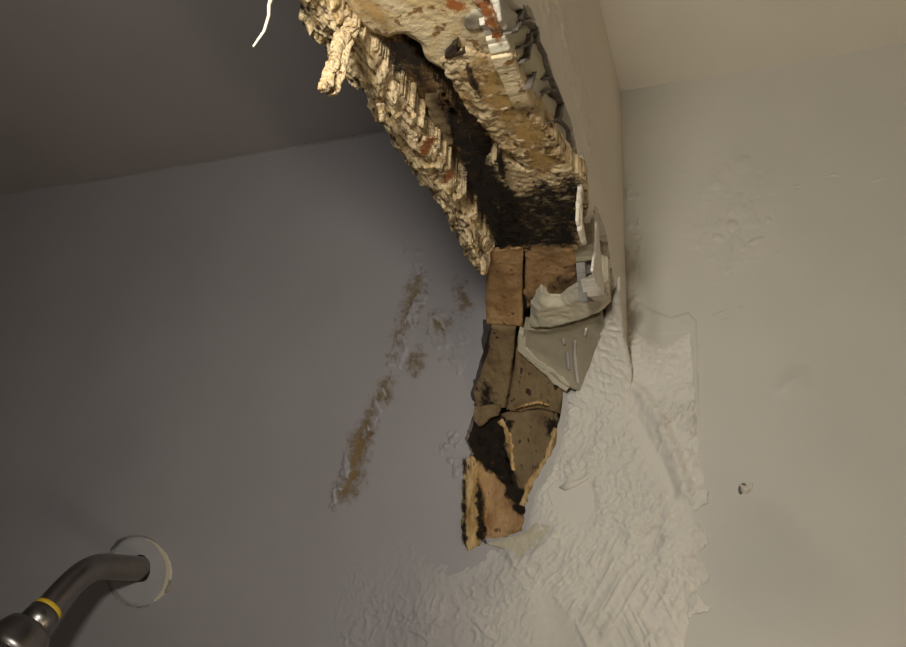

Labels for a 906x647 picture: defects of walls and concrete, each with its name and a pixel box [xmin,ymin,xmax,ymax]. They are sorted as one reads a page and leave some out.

spalling [252,0,273,47]
rust [443,0,466,13]
rust [479,1,501,42]
rust [419,135,438,156]
damp [383,42,588,249]
spalling [299,0,613,391]
damp [339,378,391,498]